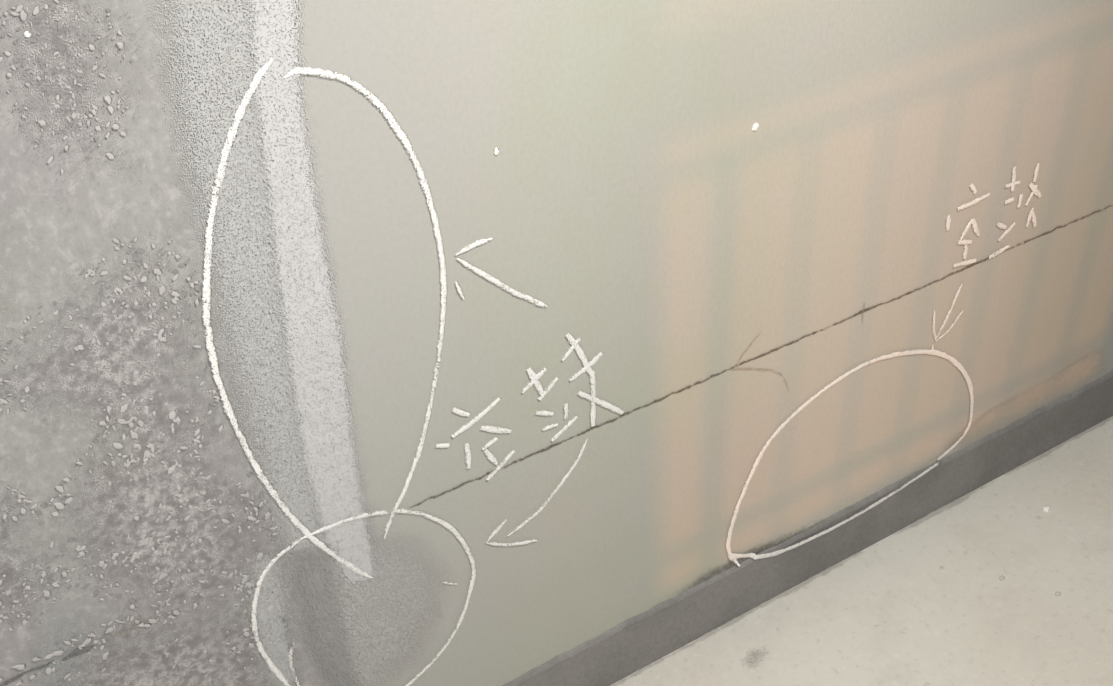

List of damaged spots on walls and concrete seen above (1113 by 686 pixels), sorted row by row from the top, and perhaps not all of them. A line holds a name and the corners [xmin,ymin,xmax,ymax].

crack [410,205,1111,508]